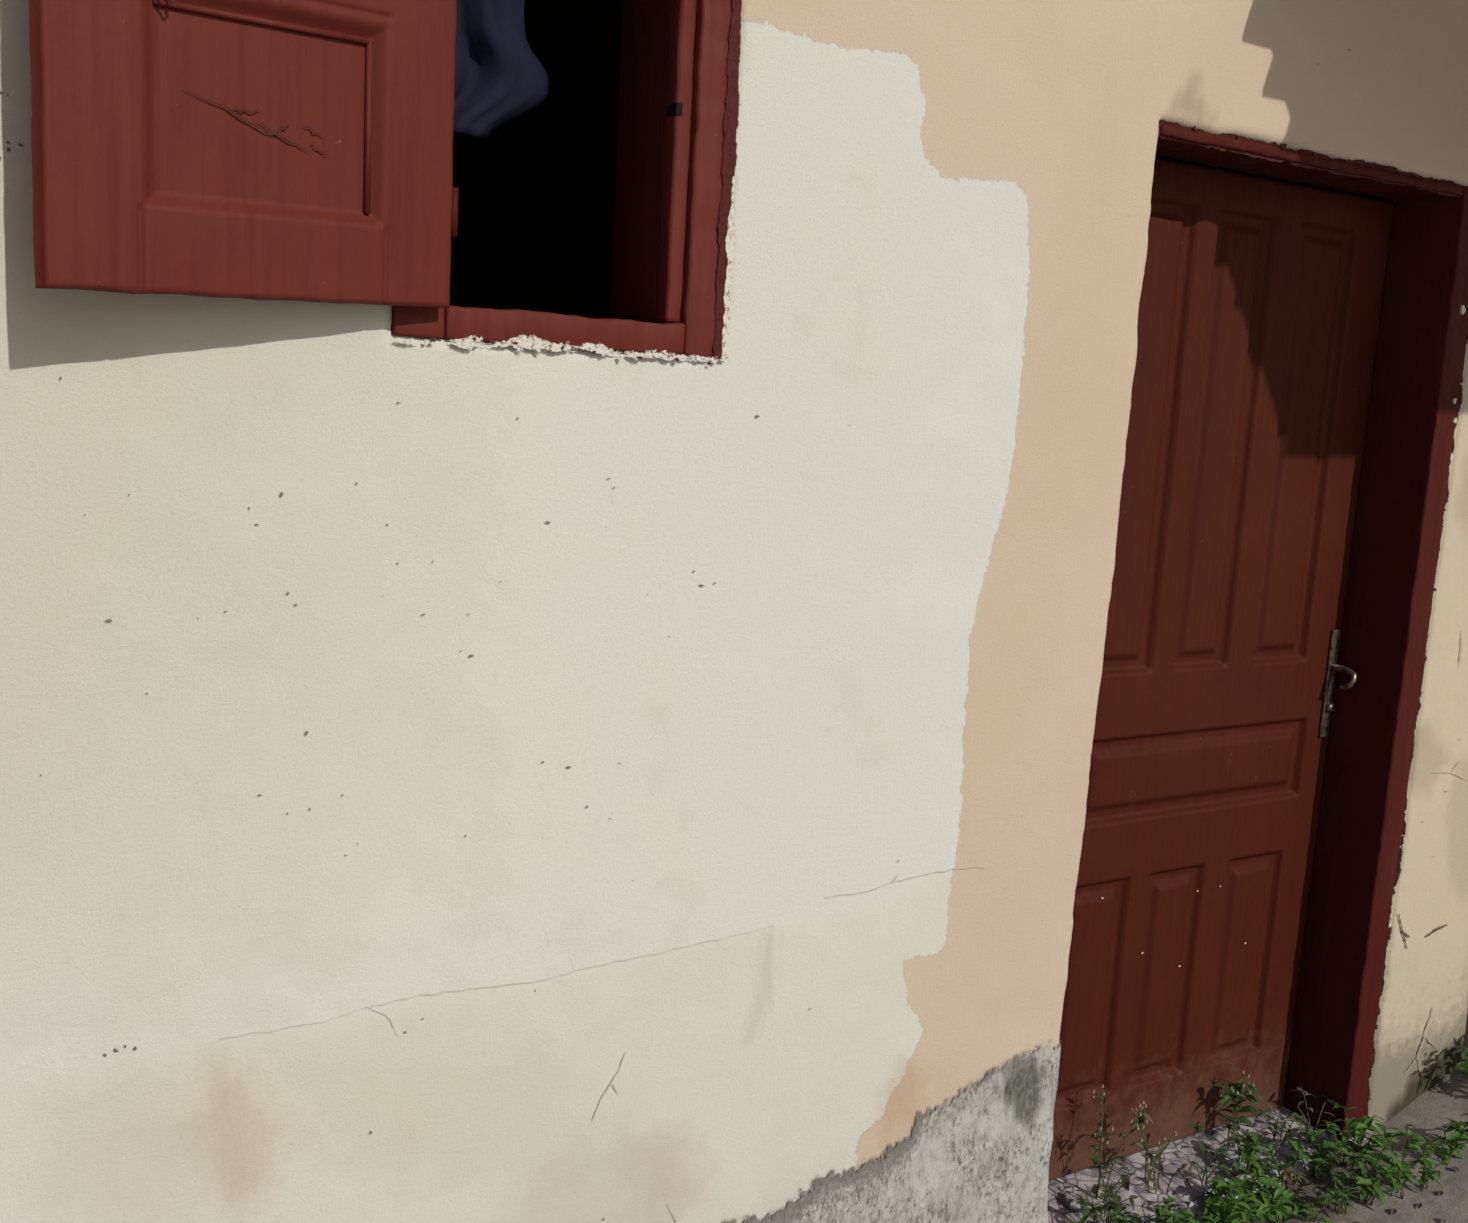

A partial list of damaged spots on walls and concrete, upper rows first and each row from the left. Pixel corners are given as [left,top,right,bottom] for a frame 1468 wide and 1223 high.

peeling [392,0,742,365]
crack [829,867,986,898]
crack [219,925,775,1040]
spalling [723,1036,1061,1223]